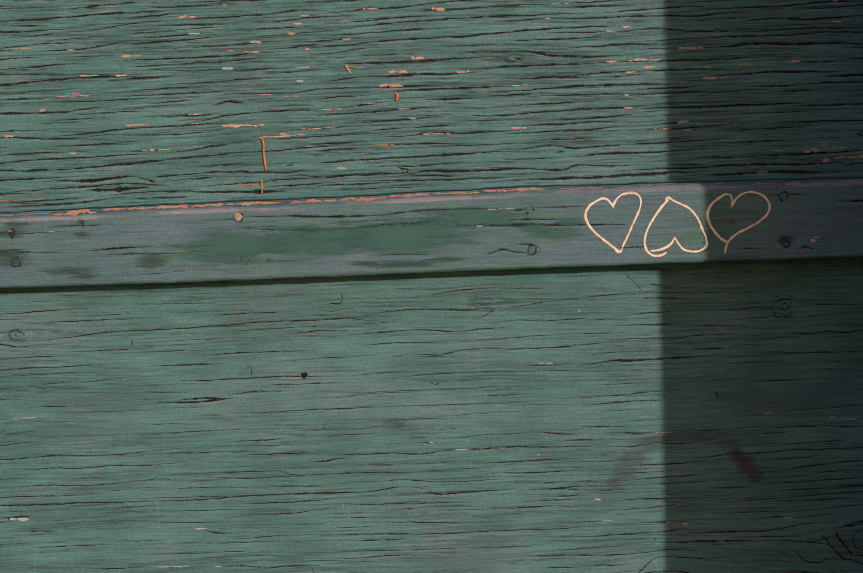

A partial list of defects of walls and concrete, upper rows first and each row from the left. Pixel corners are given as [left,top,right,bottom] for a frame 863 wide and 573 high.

peeling [0,201,279,216]
peeling [291,187,545,203]
crack [89,246,197,275]
crack [0,275,863,573]